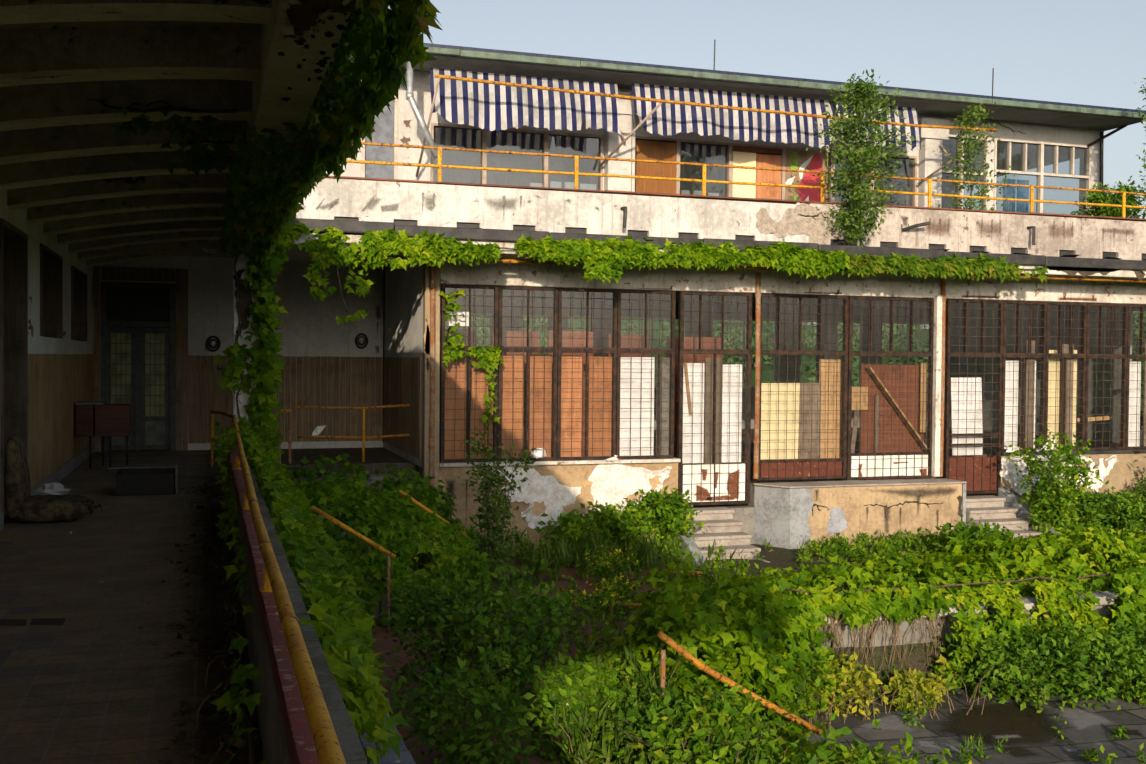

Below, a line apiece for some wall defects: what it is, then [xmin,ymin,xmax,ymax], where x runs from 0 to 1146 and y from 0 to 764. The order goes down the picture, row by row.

peeling [294,15,351,81]
peeling [492,455,672,529]
crack [864,501,943,520]